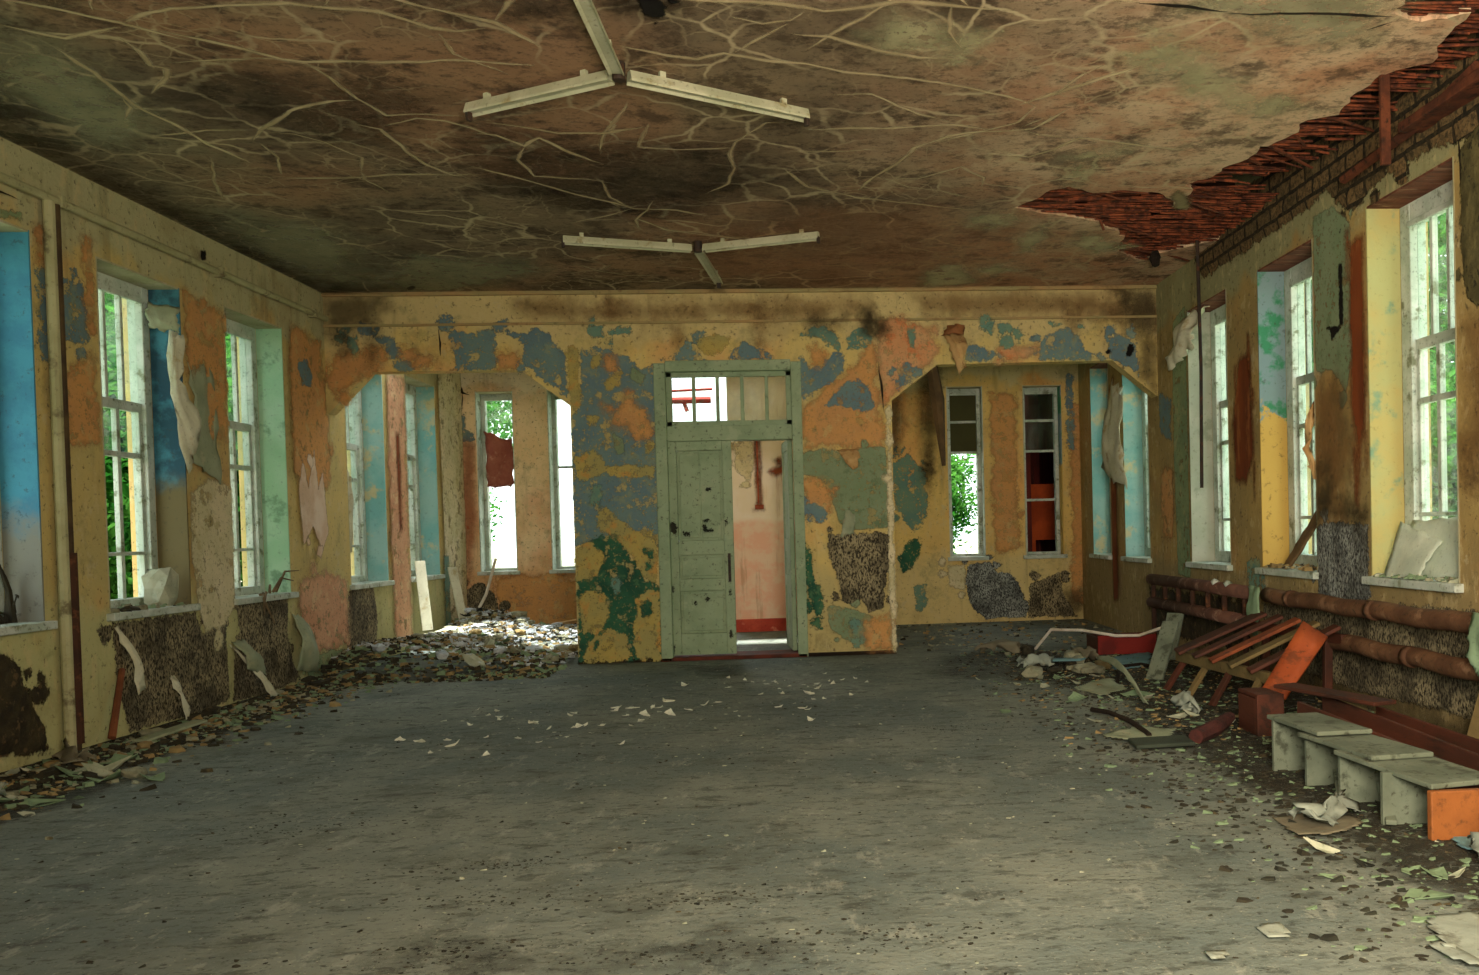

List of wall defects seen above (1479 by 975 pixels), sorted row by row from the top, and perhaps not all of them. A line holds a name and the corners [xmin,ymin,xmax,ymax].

crack [0,0,1185,240]
crack [1120,0,1392,30]
flaking render [1194,9,1479,409]
crack [1455,141,1463,185]
peeling [182,290,230,443]
flaking render [97,321,420,733]
peeling [435,314,774,664]
peeling [731,441,782,488]
peeling [798,313,939,651]
peeling [962,314,1139,620]
flaking render [1149,307,1479,719]
flaking render [0,654,165,817]